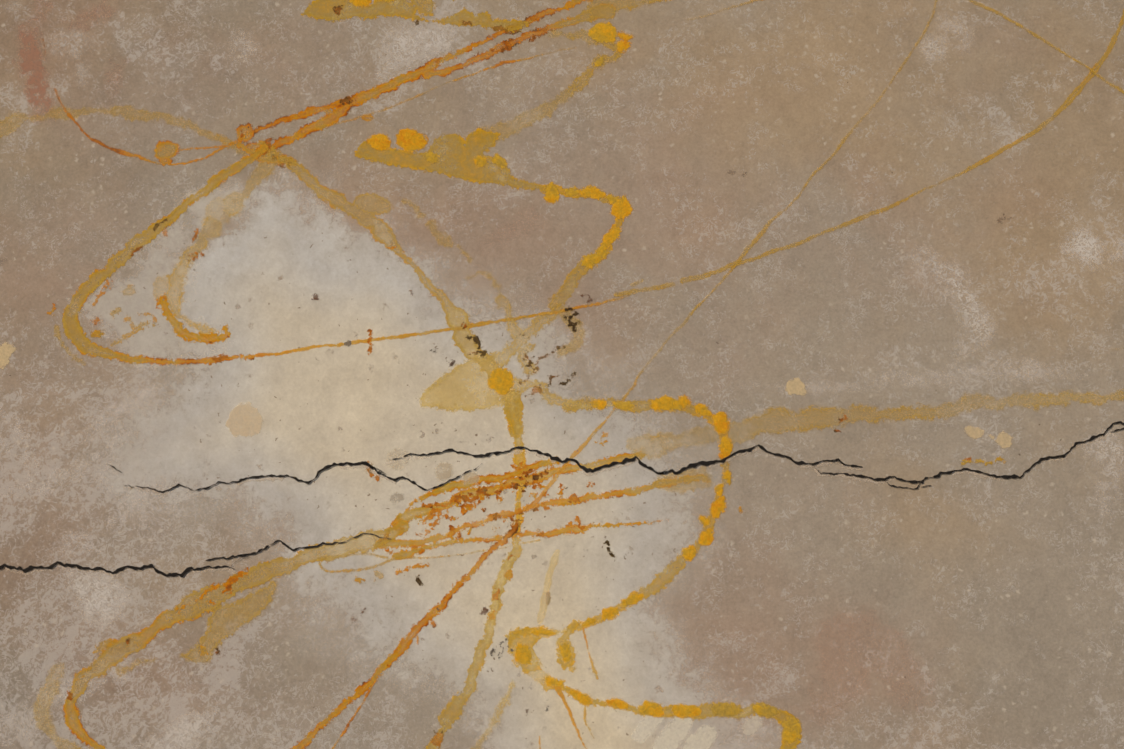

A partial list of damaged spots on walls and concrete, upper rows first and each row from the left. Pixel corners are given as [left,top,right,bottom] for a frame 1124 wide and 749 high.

crack [110,421,1124,495]
crack [0,533,389,577]